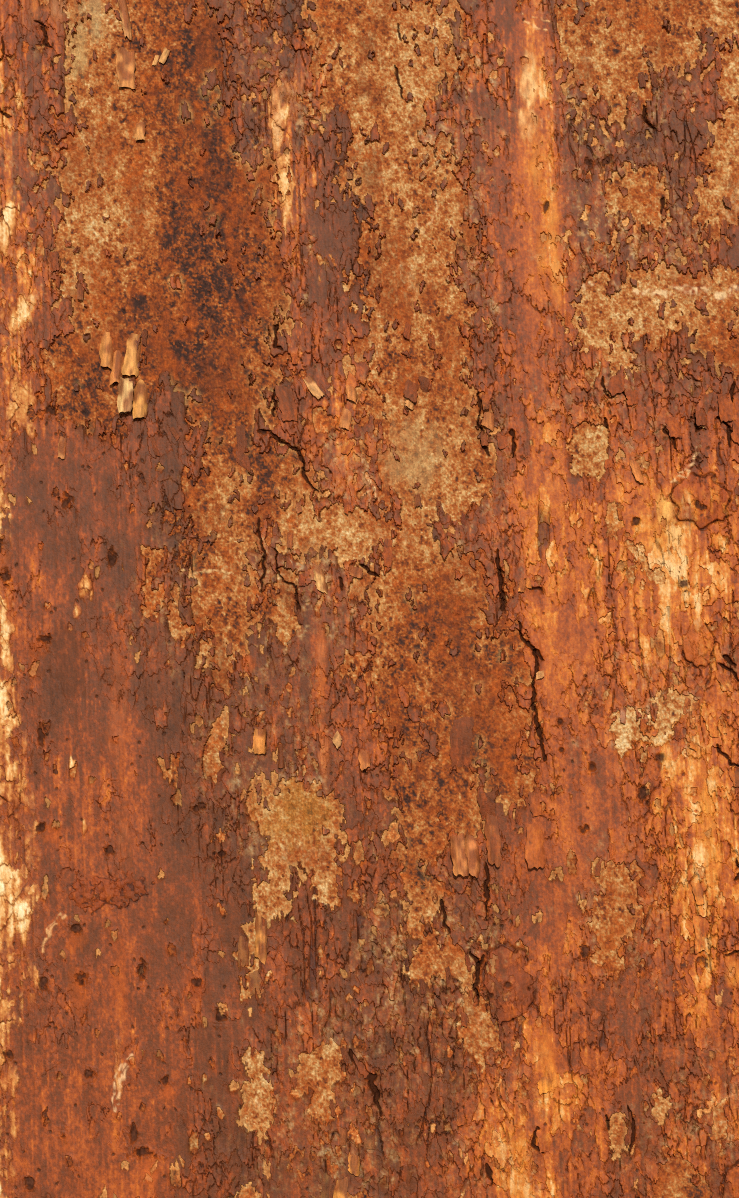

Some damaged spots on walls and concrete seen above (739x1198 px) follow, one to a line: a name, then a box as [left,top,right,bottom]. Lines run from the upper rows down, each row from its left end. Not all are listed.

corrosion [562,113,628,152]
corrosion [543,205,704,284]
peeling [555,0,739,444]
peeling [28,0,564,1077]
peeling [606,681,719,765]
crack [716,744,739,769]
crack [718,655,739,682]
corrosion [347,820,408,947]
peeling [578,844,655,981]
corrosion [122,1130,211,1198]
peeling [238,1039,376,1198]
corrosion [287,1035,376,1181]